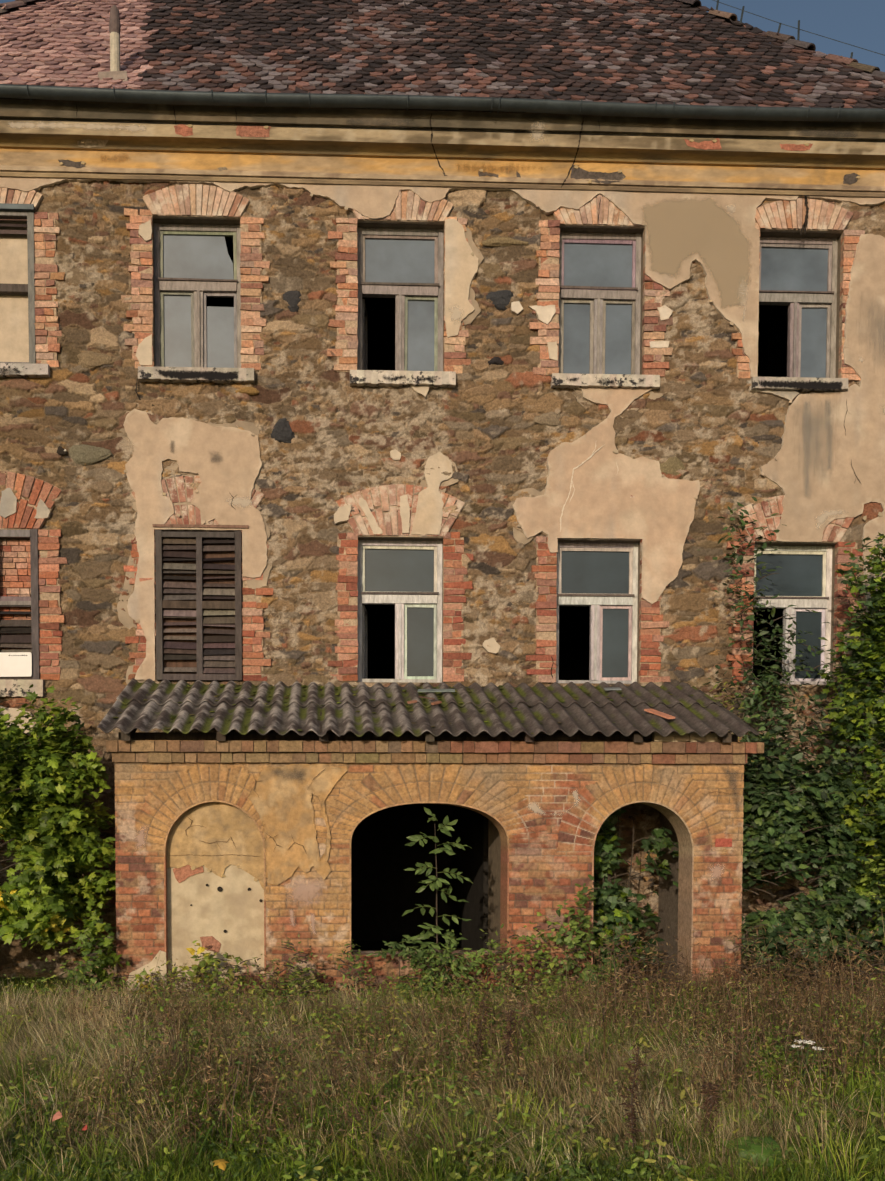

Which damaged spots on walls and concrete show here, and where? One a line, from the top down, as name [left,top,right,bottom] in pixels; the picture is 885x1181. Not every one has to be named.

crack [429,113,445,174]
crack [561,117,600,187]
spalling [0,138,885,902]
spalling [0,889,117,978]
spalling [200,930,227,952]
spalling [594,803,659,971]
spalling [741,827,885,974]